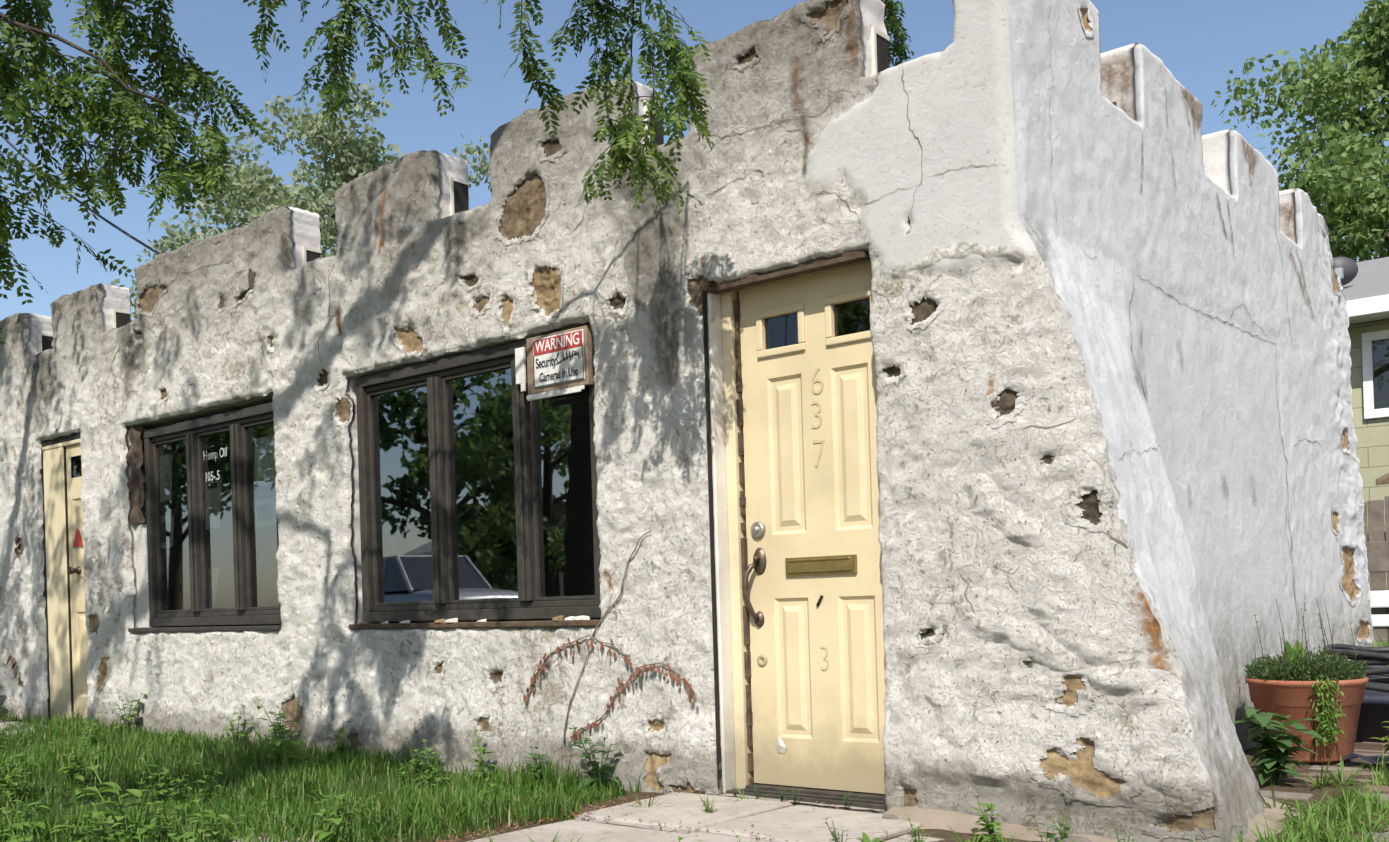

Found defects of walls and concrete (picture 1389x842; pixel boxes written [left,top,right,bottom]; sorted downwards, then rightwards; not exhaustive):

peeling [1078,0,1094,38]
peeling [493,131,566,247]
crack [807,65,999,228]
peeling [388,320,427,359]
peeling [456,259,564,334]
leakage [606,157,682,385]
spalling [981,380,1034,428]
crack [1129,209,1321,624]
spalling [1060,481,1115,533]
peeling [1331,506,1372,644]
peeling [638,708,713,795]
peeling [1020,669,1220,841]